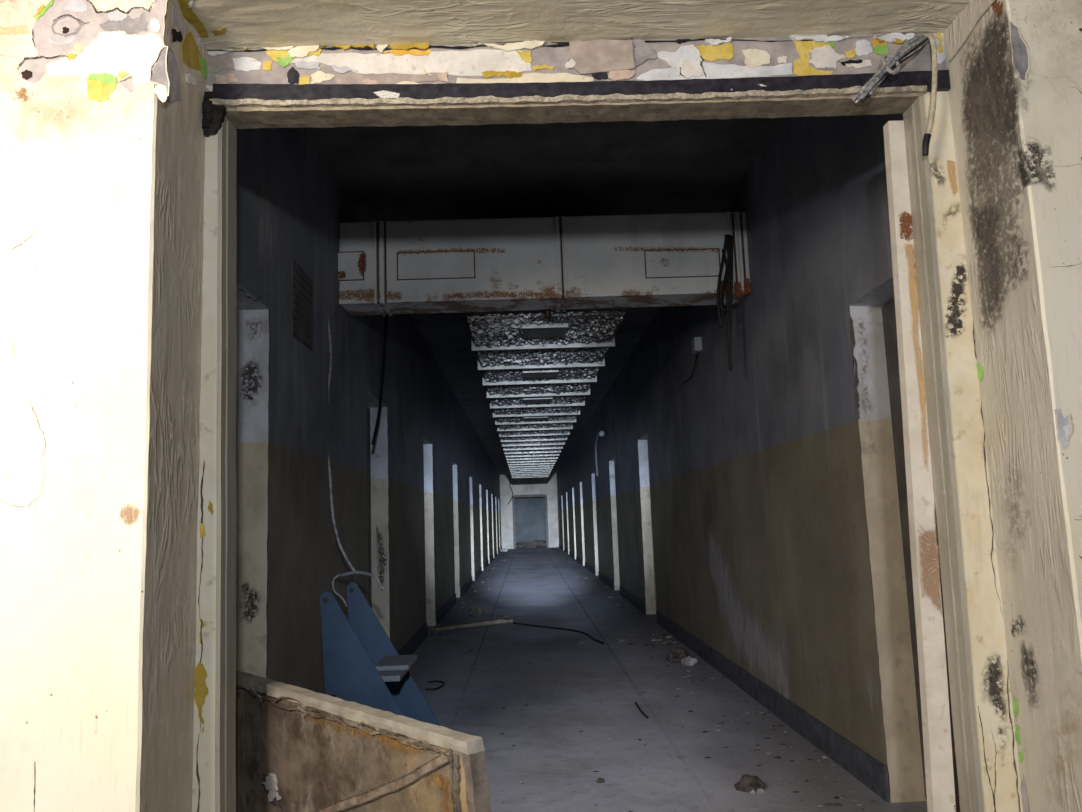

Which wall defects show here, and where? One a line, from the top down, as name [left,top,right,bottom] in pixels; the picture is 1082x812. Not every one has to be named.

flaking render [16,0,594,105]
peeling [608,33,915,81]
flaking render [1010,21,1031,82]
water stain [964,18,1054,328]
corrosion [358,253,366,275]
corrosion [338,271,401,301]
corrosion [443,291,555,299]
corrosion [900,212,927,454]
water stain [948,266,967,334]
crack [1,402,46,507]
corrosion [917,507,941,607]
water stain [987,659,1005,733]